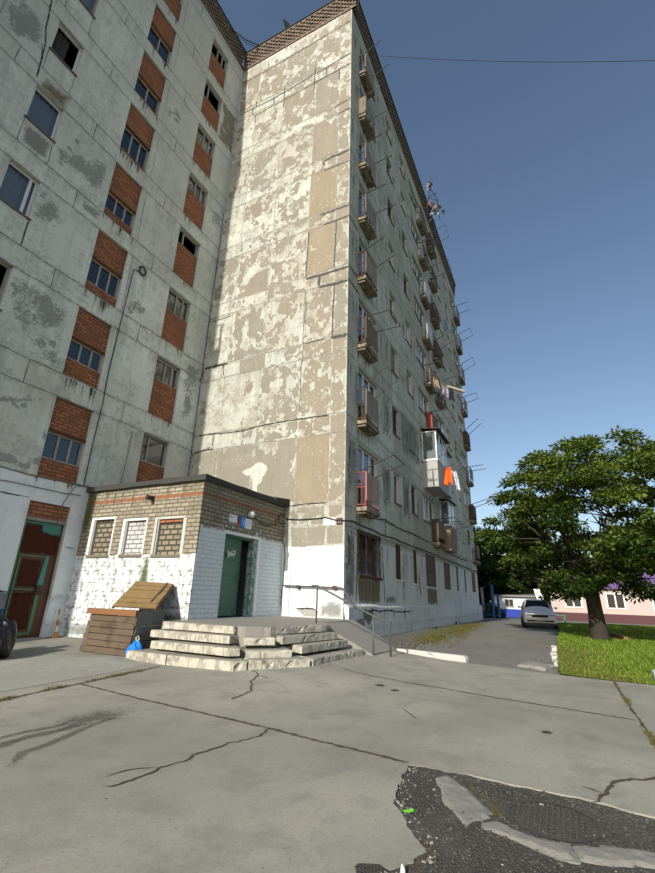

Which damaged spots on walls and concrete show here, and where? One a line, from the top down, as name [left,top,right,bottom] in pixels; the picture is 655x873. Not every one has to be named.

peeling [183,10,357,597]
crack [231,670,268,700]
crack [104,728,269,787]
crack [584,776,655,802]
spalling [436,775,655,869]